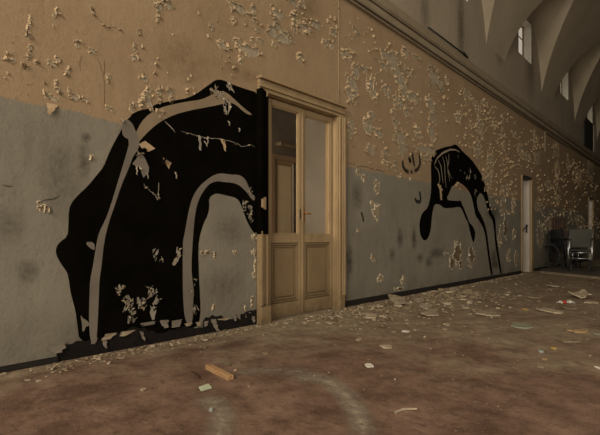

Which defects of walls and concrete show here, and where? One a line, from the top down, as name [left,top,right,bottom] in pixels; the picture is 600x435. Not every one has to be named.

peeling [3,14,61,70]
peeling [42,65,89,115]
peeling [121,57,174,123]
peeling [210,0,600,248]
peeling [132,141,155,178]
peeling [443,238,476,270]
spalling [46,284,289,370]